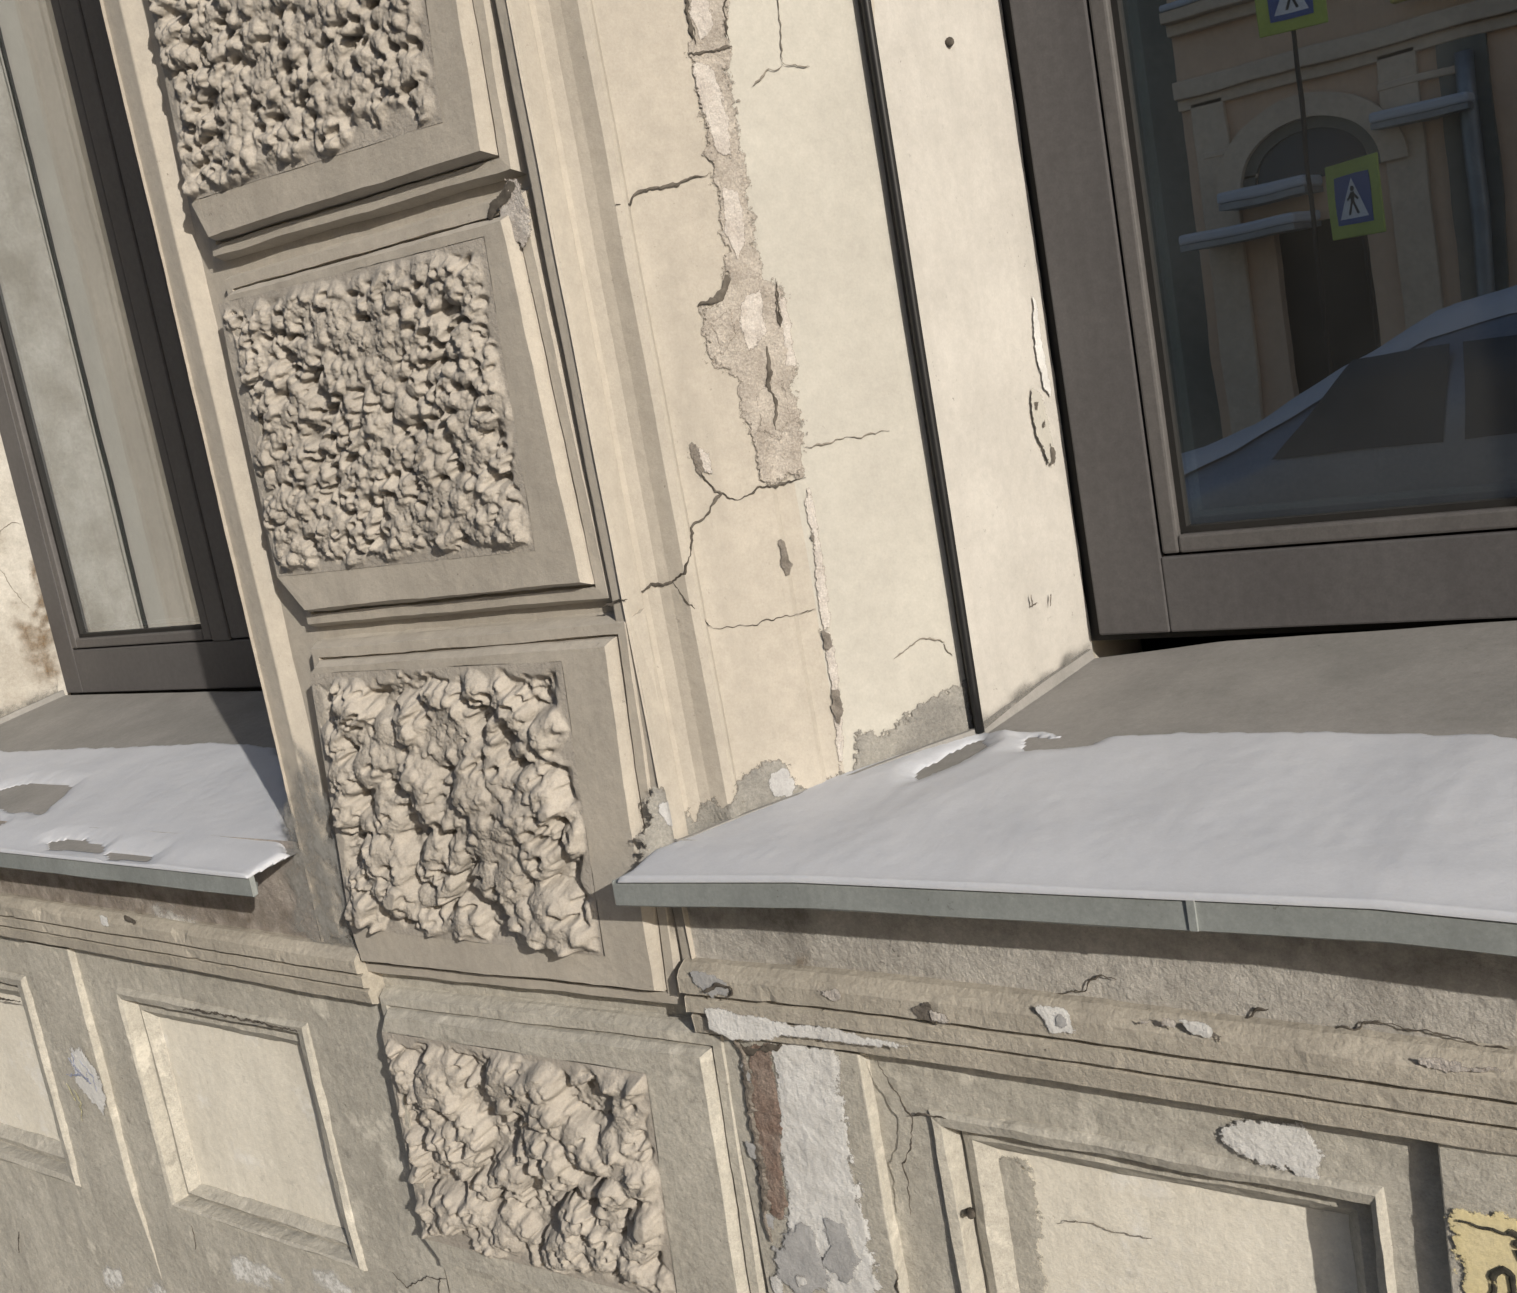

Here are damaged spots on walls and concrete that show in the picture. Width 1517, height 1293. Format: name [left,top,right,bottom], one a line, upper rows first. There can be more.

crack [753,0,810,86]
spalling [487,179,533,247]
crack [616,173,709,206]
flaking render [685,0,844,769]
crack [603,430,885,629]
peeling [769,768,796,797]
crack [1058,974,1116,994]
crack [1335,1020,1512,1050]
peeling [690,971,908,1293]
crack [877,1060,946,1214]
peeling [1220,1118,1326,1179]
peeling [999,1156,1048,1293]